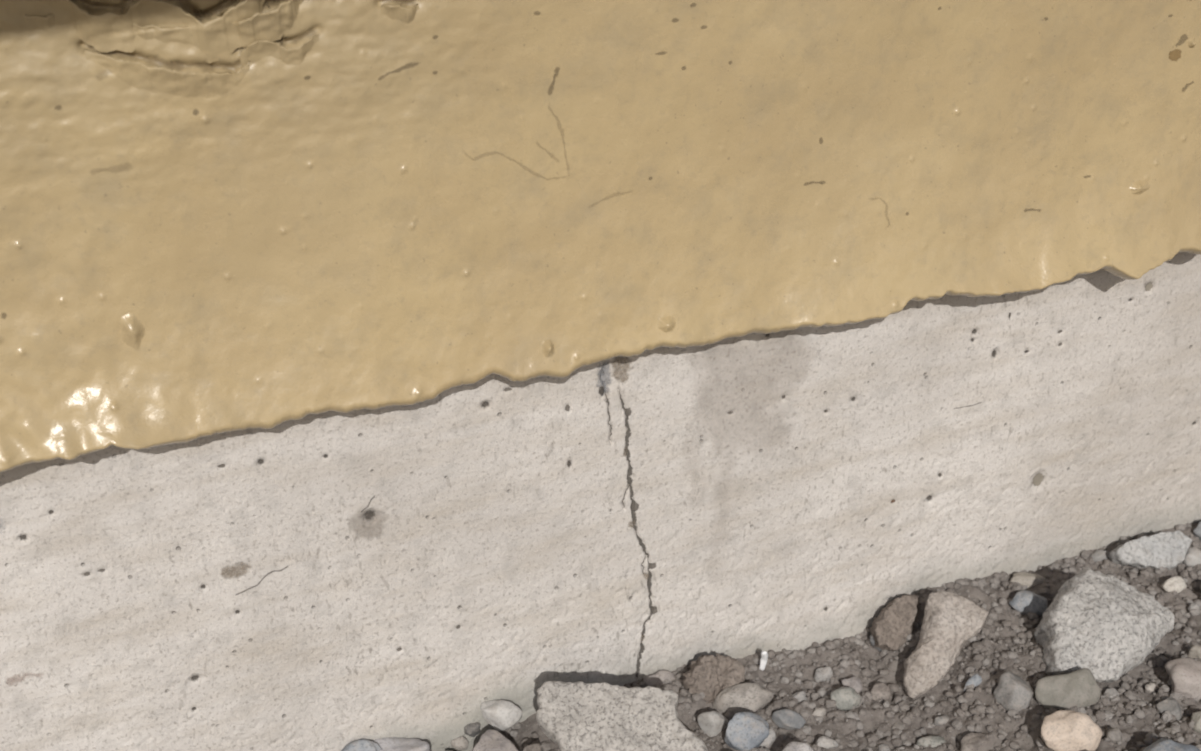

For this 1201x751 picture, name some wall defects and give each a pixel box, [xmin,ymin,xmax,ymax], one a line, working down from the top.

spalling [598,358,629,395]
crack [600,369,657,677]
spalling [222,565,248,577]